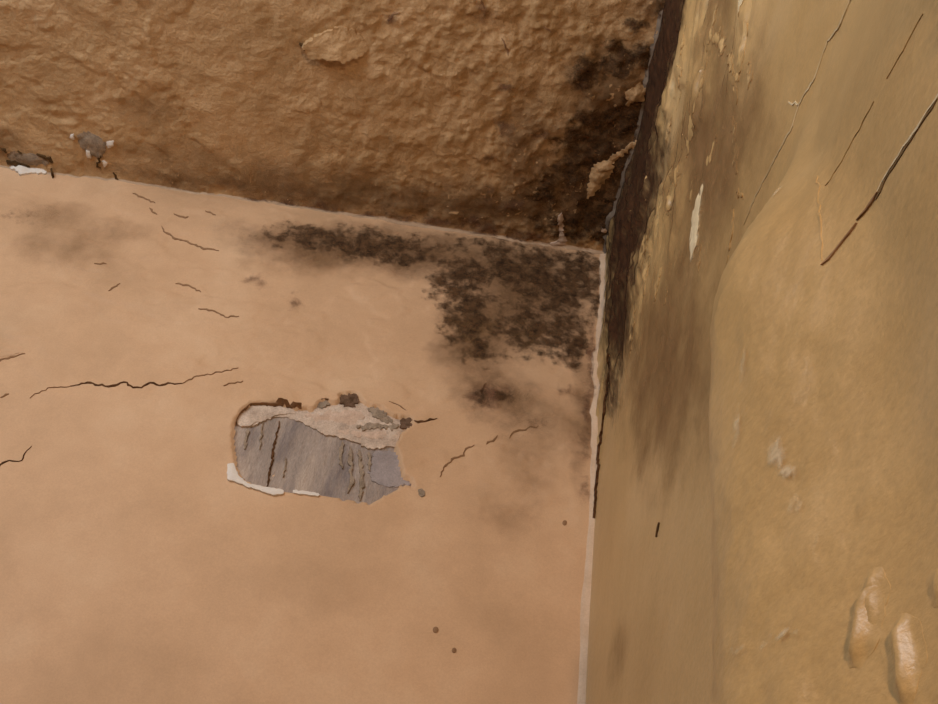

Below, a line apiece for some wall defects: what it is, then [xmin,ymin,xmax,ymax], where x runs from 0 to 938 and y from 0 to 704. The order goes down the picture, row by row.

peeling [1,148,54,178]
water stain [261,0,694,439]
peeling [587,140,637,199]
peeling [625,82,646,106]
peeling [689,183,703,272]
water stain [684,79,753,223]
crack [743,0,851,225]
crack [820,94,938,265]
crack [0,368,243,398]
crack [0,446,32,466]
spalling [227,393,437,505]
crack [440,426,538,477]